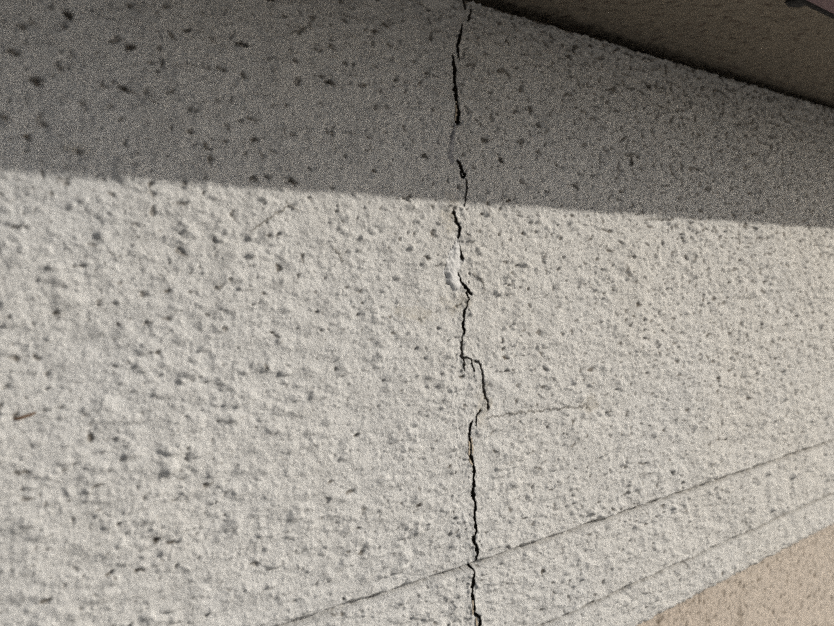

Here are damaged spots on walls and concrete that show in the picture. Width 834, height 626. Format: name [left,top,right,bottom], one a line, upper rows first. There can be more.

crack [452,0,472,124]
crack [452,160,590,626]